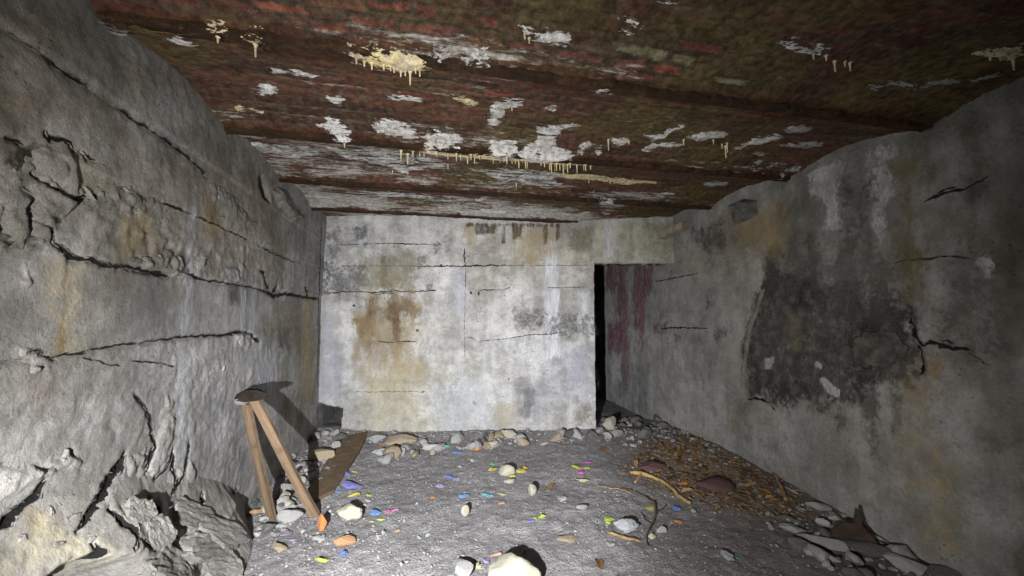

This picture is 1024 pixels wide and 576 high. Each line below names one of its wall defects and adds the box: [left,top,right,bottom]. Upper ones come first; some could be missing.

leakage [518,25,571,47]
crack [2,29,208,181]
leakage [258,67,320,96]
leakage [343,37,491,103]
leakage [487,98,523,126]
crack [29,172,95,202]
leakage [251,117,675,197]
crack [7,203,586,380]
leakage [642,125,920,454]
crack [908,314,985,375]
spalling [0,449,82,502]
crack [74,394,206,561]